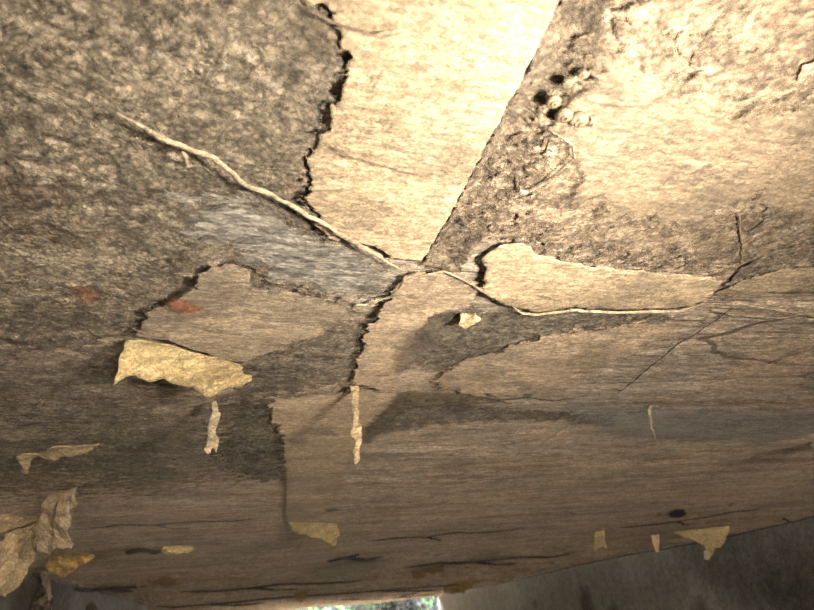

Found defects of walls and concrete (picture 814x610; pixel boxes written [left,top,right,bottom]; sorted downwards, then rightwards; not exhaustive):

crack [334,145,426,178]
spalling [0,0,814,465]
crack [477,306,814,455]
spalling [0,277,413,601]
spalling [669,510,686,518]
peeling [593,530,607,553]
peeling [651,526,730,560]
peeling [443,580,478,594]